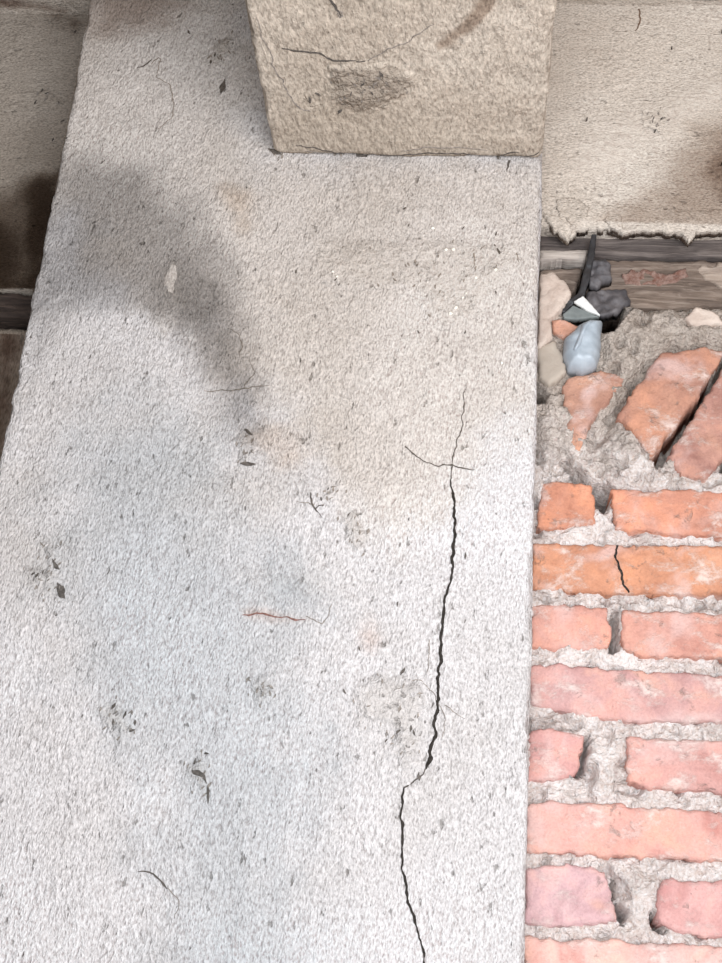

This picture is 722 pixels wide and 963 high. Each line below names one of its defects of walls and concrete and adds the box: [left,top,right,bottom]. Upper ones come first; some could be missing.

crack [399,389,473,963]
crack [614,545,630,593]